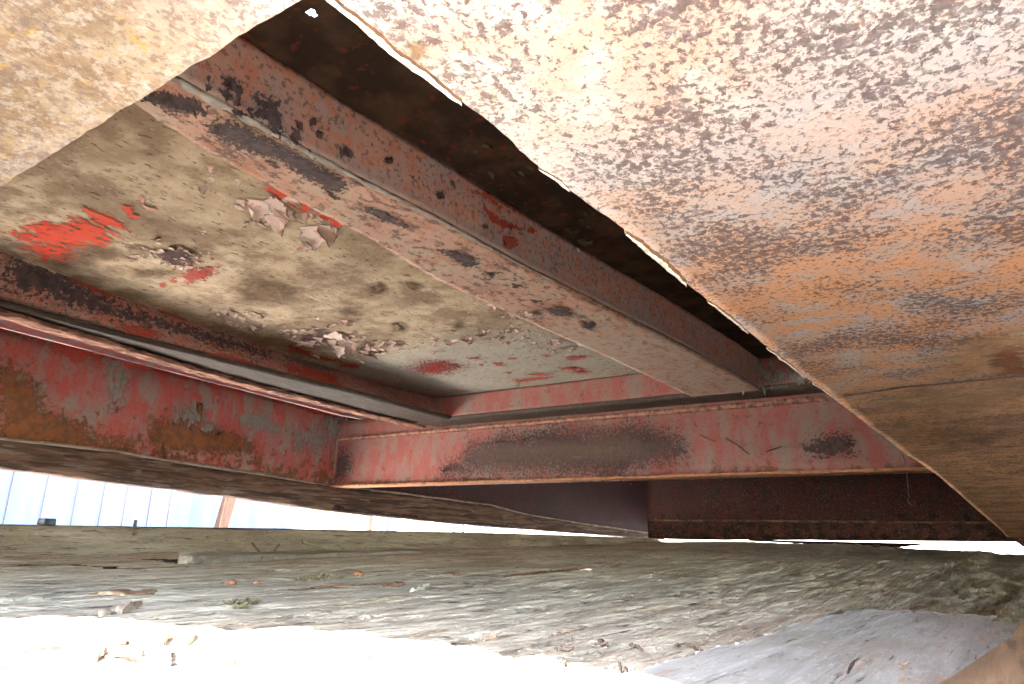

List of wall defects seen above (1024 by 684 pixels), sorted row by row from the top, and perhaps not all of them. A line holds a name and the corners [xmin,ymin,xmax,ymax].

rust [141,75,354,200]
peeling [234,178,342,255]
rust [360,204,410,229]
water stain [55,246,125,268]
water stain [133,269,172,278]
peeling [113,238,215,274]
water stain [240,281,294,305]
water stain [369,283,385,294]
rust [437,249,499,278]
peeling [209,304,584,371]
rust [0,358,256,458]
rust [801,429,861,463]